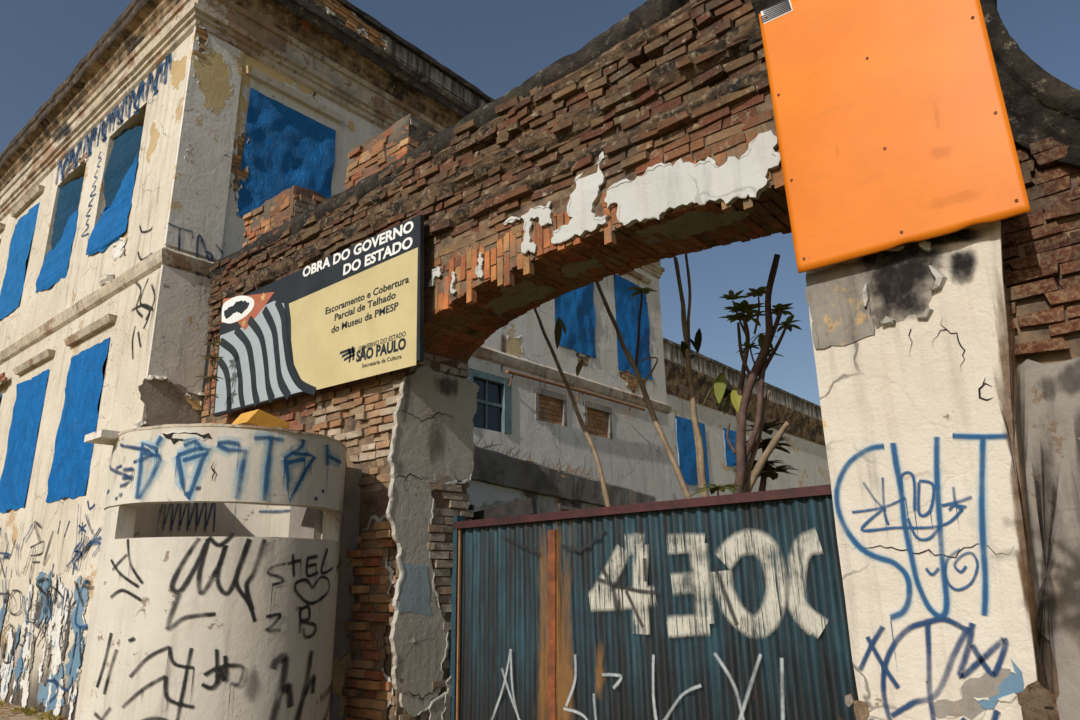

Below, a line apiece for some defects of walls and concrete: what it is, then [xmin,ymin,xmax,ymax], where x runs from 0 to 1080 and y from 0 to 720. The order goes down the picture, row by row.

spalling [312,0,388,50]
flaking render [170,26,319,215]
flaking render [503,130,781,254]
crack [908,320,991,401]
spalling [133,375,212,444]
crack [389,470,466,508]
spalling [341,485,404,720]
damp [1033,457,1056,690]
damp [5,679,74,720]
spalling [927,657,1060,720]